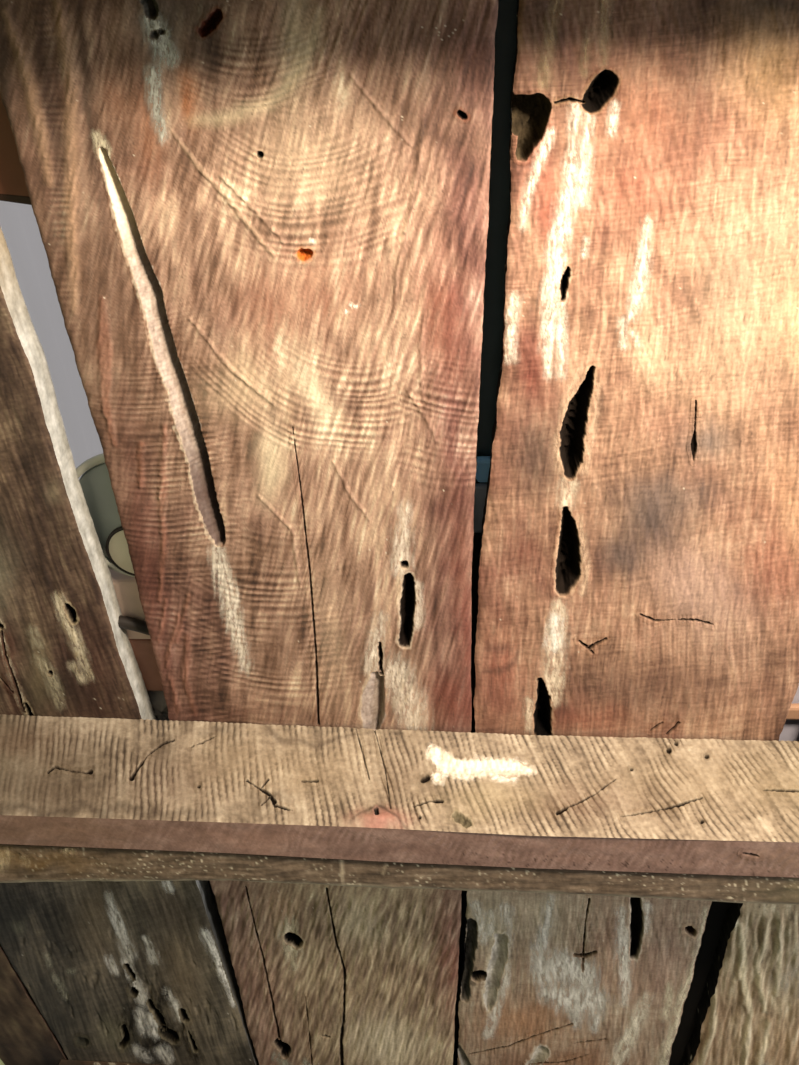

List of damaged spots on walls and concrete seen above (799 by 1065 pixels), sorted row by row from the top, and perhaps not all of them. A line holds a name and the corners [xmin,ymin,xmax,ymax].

leakage [521,130,554,227]
leakage [541,104,591,417]
leakage [505,294,516,360]
crack [288,422,324,727]
crack [635,609,719,630]
crack [351,728,449,812]
crack [551,774,708,821]
leakage [105,893,170,1065]
leakage [202,930,234,1004]
crack [241,882,350,1065]
leakage [531,896,606,1030]
crack [569,894,602,976]